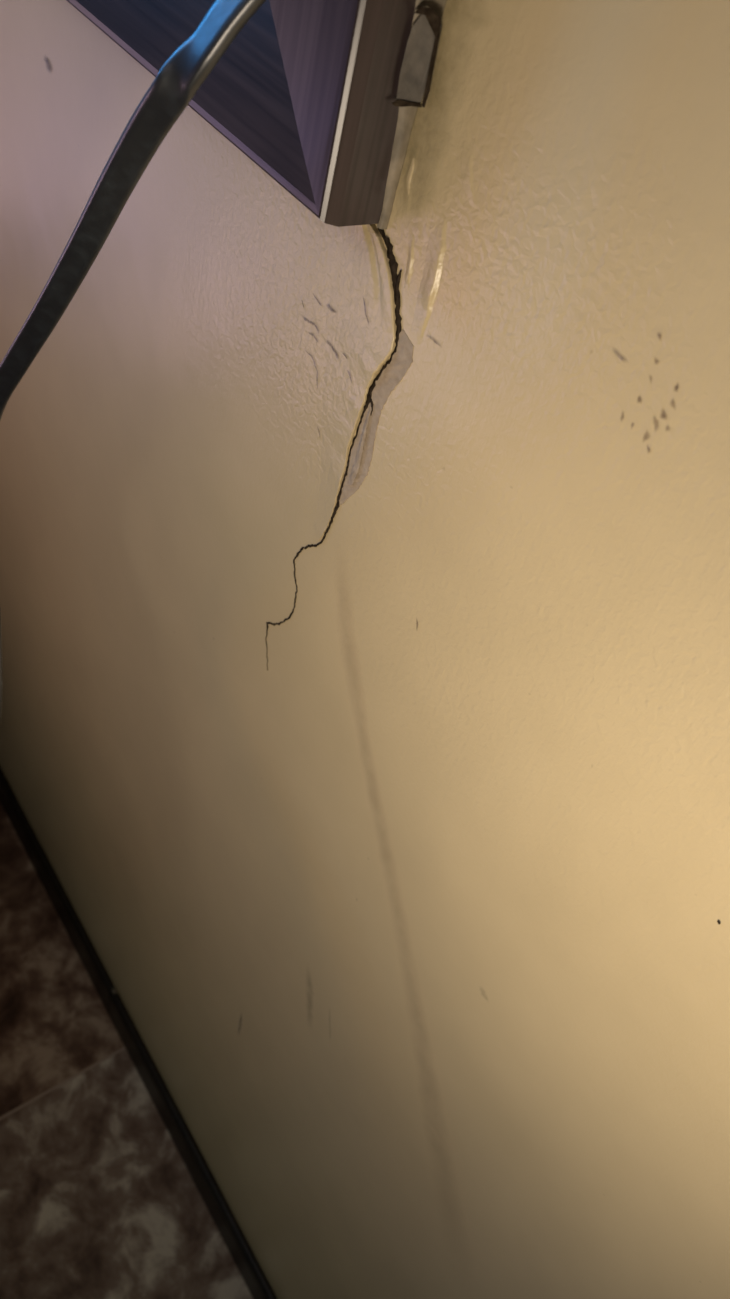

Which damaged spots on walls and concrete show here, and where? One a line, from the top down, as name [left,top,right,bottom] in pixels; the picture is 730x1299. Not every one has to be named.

crack [265,228,402,670]